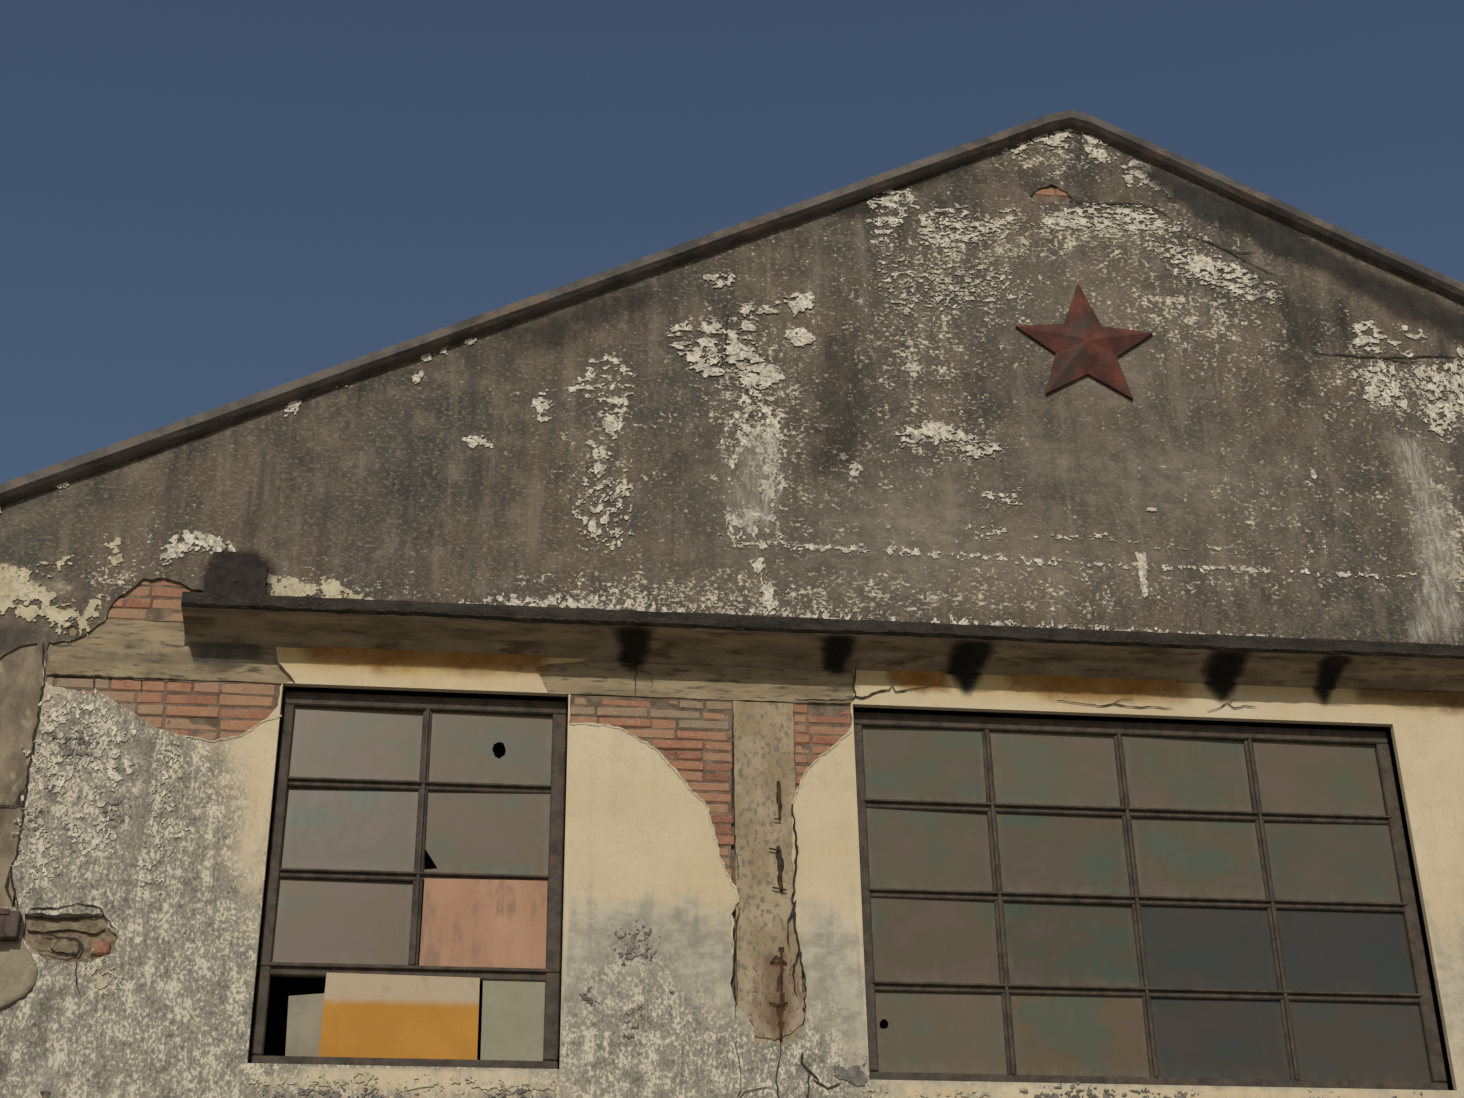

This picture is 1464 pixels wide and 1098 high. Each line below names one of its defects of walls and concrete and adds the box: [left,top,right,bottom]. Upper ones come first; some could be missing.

peeling [1004,129,1284,304]
peeling [459,270,1304,638]
peeling [0,530,236,642]
leakage [204,550,269,595]
leakage [948,640,992,692]
crack [1057,699,1167,709]
leakage [1204,651,1247,700]
crack [1207,699,1257,712]
leakage [1315,655,1352,703]
flaking render [4,677,284,996]
flaking render [569,695,739,955]
crack [731,711,841,1098]